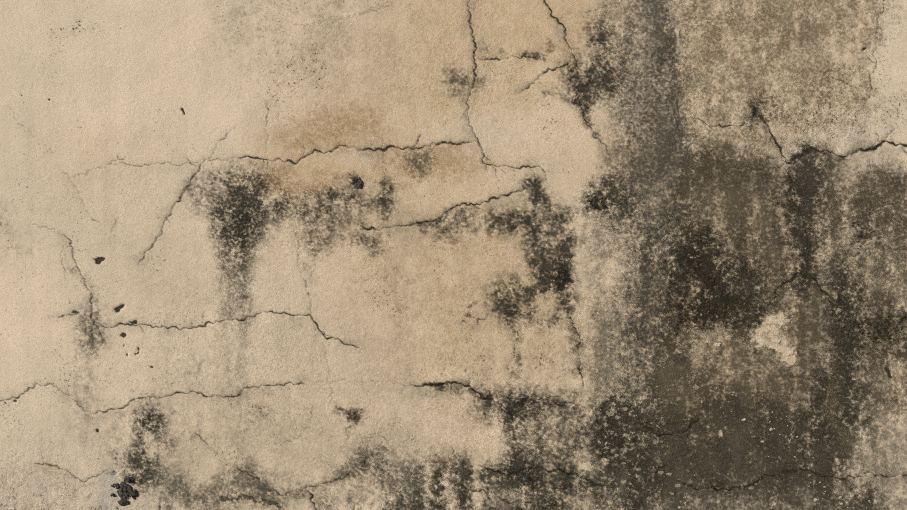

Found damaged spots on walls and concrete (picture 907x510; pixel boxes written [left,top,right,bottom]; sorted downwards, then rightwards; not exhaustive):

crack [141,0,580,260]
crack [693,107,907,197]
crack [59,236,358,348]
leakage [188,166,393,272]
leakage [397,0,907,510]
crack [772,273,834,311]
crack [77,382,302,414]
crack [237,437,382,510]
crack [414,317,583,420]
crack [464,466,609,509]
crack [638,406,708,455]
crack [682,463,906,491]